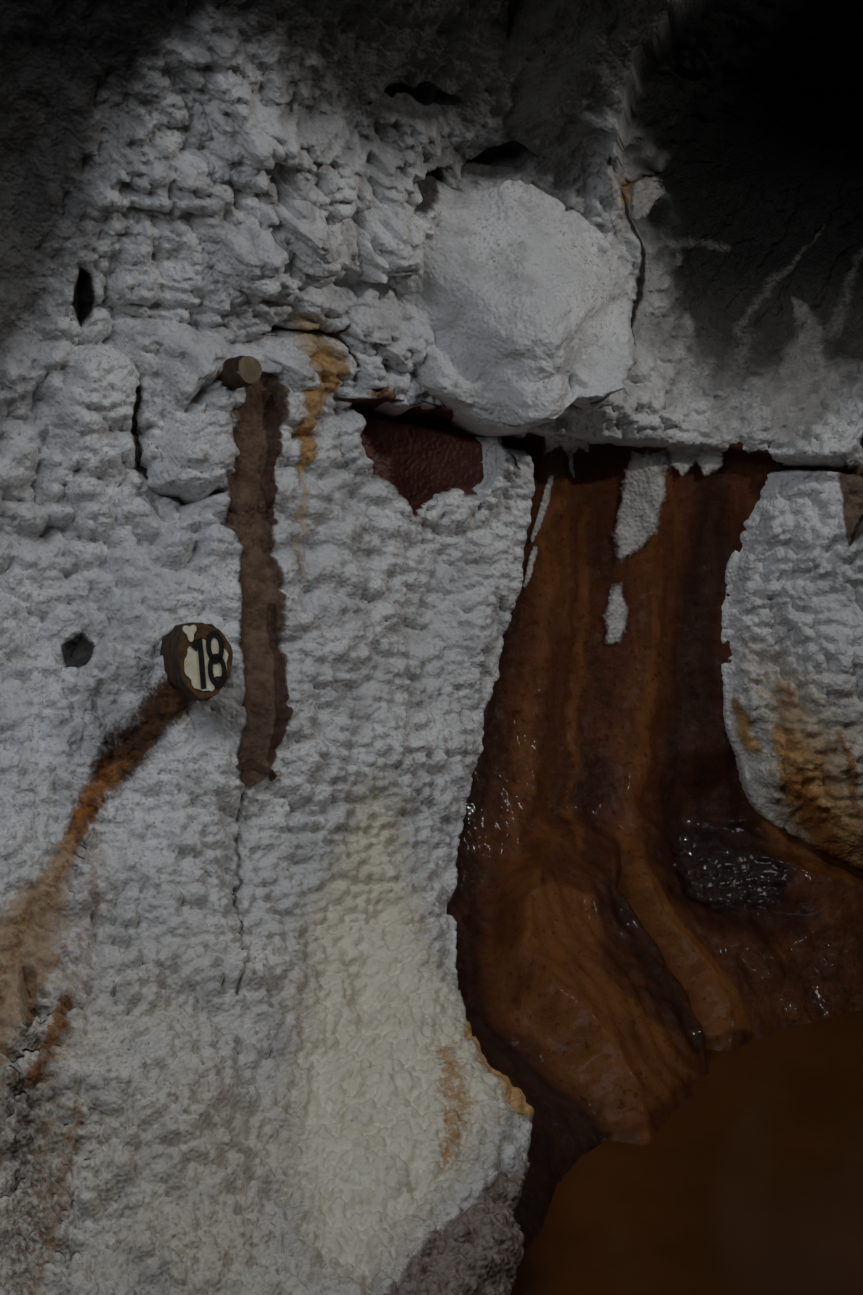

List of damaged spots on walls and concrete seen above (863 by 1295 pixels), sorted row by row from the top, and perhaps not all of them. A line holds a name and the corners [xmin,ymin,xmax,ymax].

crack [609,157,646,346]
rust [290,313,350,581]
spalling [338,397,515,534]
crack [334,397,525,469]
crack [781,438,863,477]
crack [848,514,863,546]
rust [446,433,863,1275]
rust [0,673,196,1294]